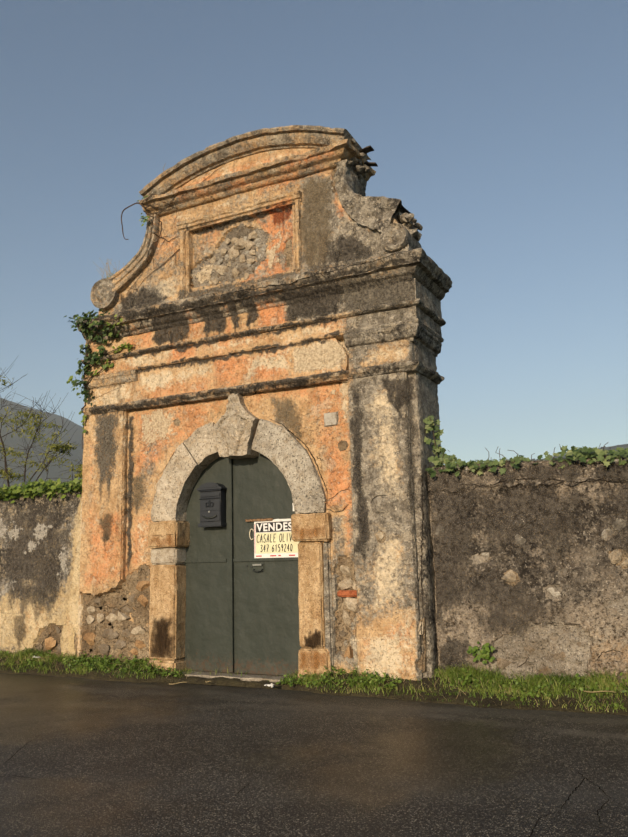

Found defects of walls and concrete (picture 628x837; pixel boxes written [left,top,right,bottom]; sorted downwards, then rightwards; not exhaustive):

flaking render [190,223,293,288]
damp [84,178,415,374]
damp [90,370,349,567]
damp [350,389,372,565]
crack [446,478,627,492]
damp [14,615,26,644]
damp [3,509,60,606]
flaking render [35,564,150,662]
damp [151,619,174,659]
damp [304,630,323,649]
flaking render [334,556,357,658]
crack [416,477,424,669]